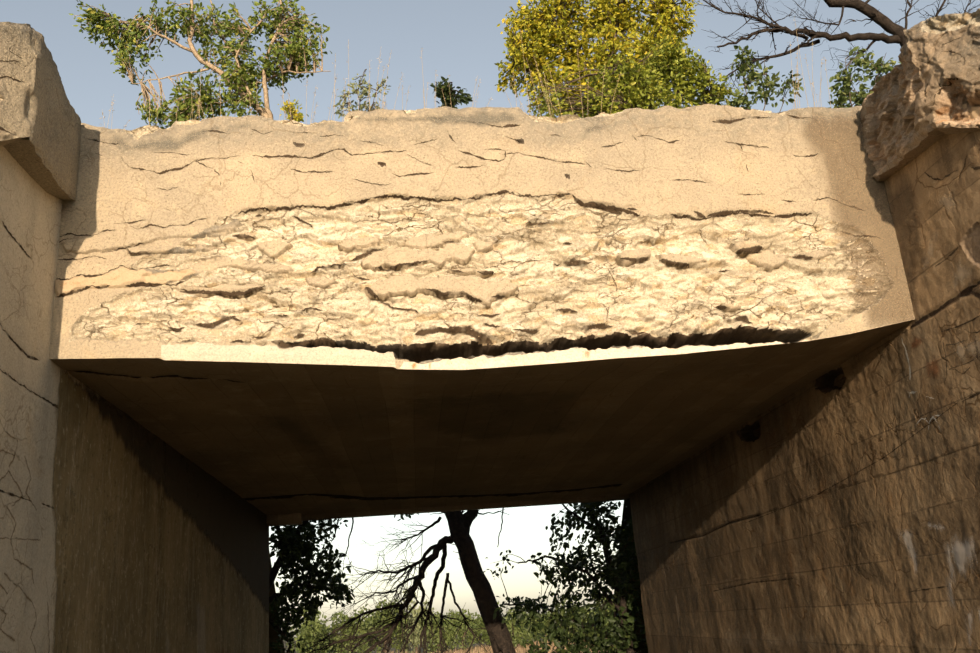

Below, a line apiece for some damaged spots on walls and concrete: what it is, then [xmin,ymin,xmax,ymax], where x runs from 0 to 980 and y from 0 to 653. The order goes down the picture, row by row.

crack [0,51,21,82]
crack [914,37,980,106]
crack [671,194,865,221]
crack [2,221,31,258]
crack [57,121,689,348]
crack [718,245,764,272]
crack [792,253,813,261]
spalling [55,192,895,370]
crack [0,323,39,361]
crack [670,281,980,543]
damp [904,532,917,570]
damp [948,542,974,571]